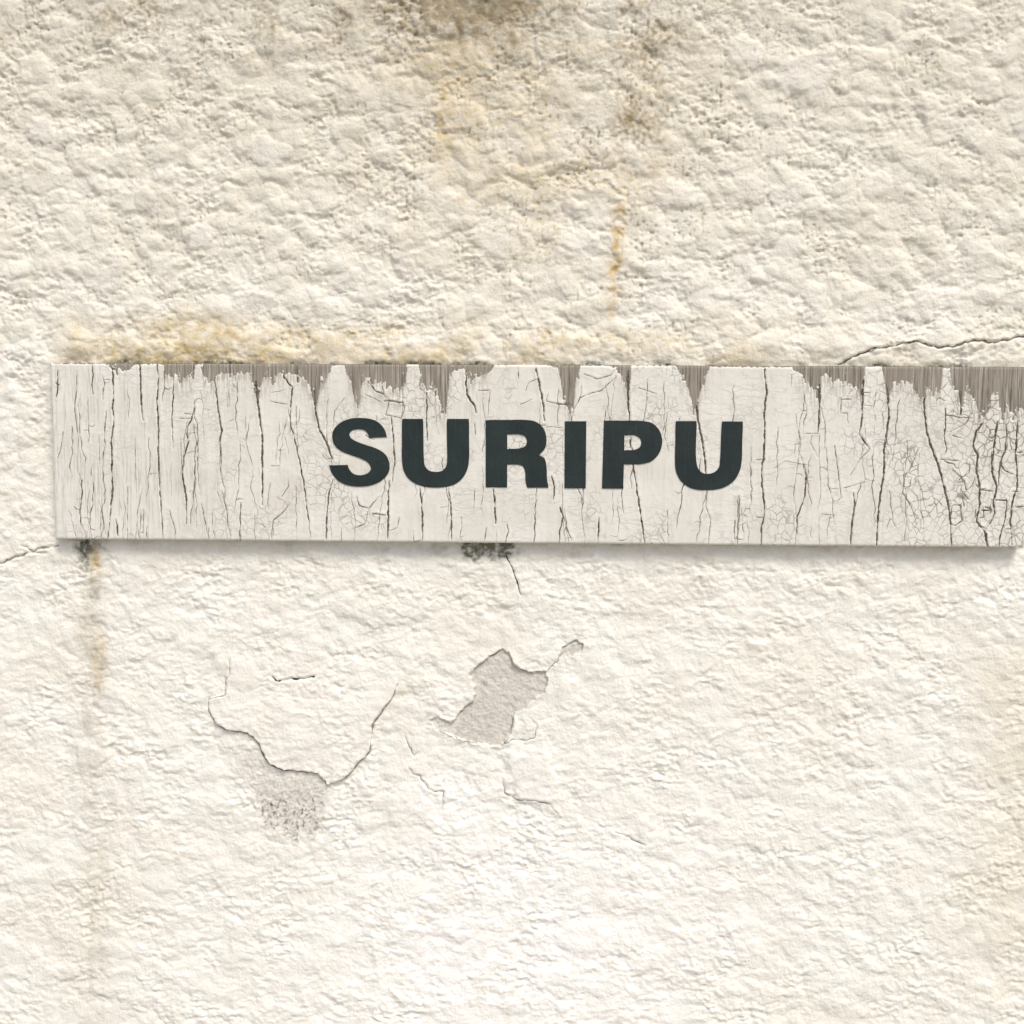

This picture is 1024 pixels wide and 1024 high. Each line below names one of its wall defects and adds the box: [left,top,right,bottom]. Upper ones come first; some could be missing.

leakage [0,0,1024,373]
crack [838,336,1024,365]
spalling [429,639,585,748]
leakage [57,539,1024,1024]